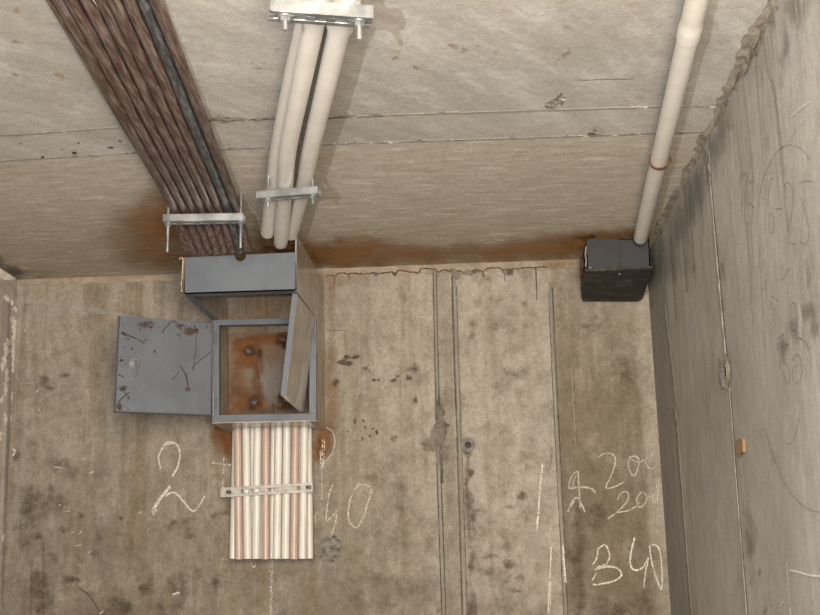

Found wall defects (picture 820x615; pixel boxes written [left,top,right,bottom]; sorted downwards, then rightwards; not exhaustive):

corrosion [128,199,186,266]
corrosion [259,230,635,268]
crack [326,266,548,299]
peeling [0,294,26,441]
corrosion [213,425,232,458]